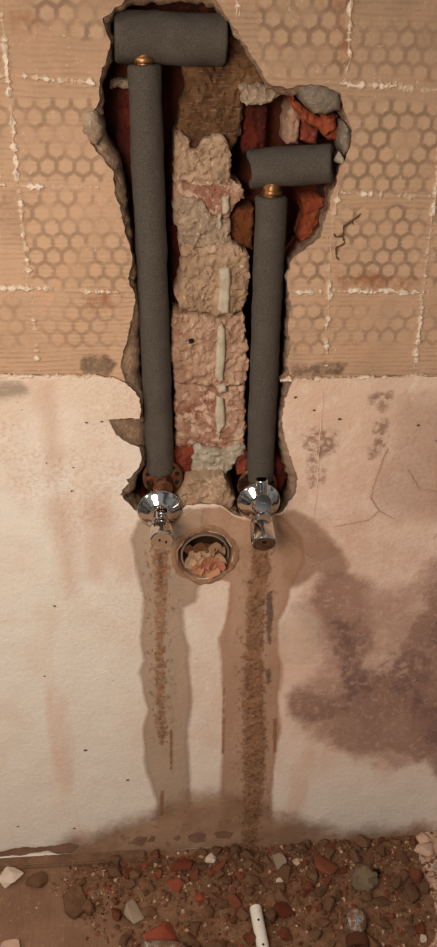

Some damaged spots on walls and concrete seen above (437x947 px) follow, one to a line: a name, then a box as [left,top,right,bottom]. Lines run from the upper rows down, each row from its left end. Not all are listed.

spalling [90,0,352,517]
crack [336,447,394,527]
corrosion [145,543,173,769]
leakage [69,508,437,857]
corrosion [239,548,276,847]
leakage [0,866,131,947]